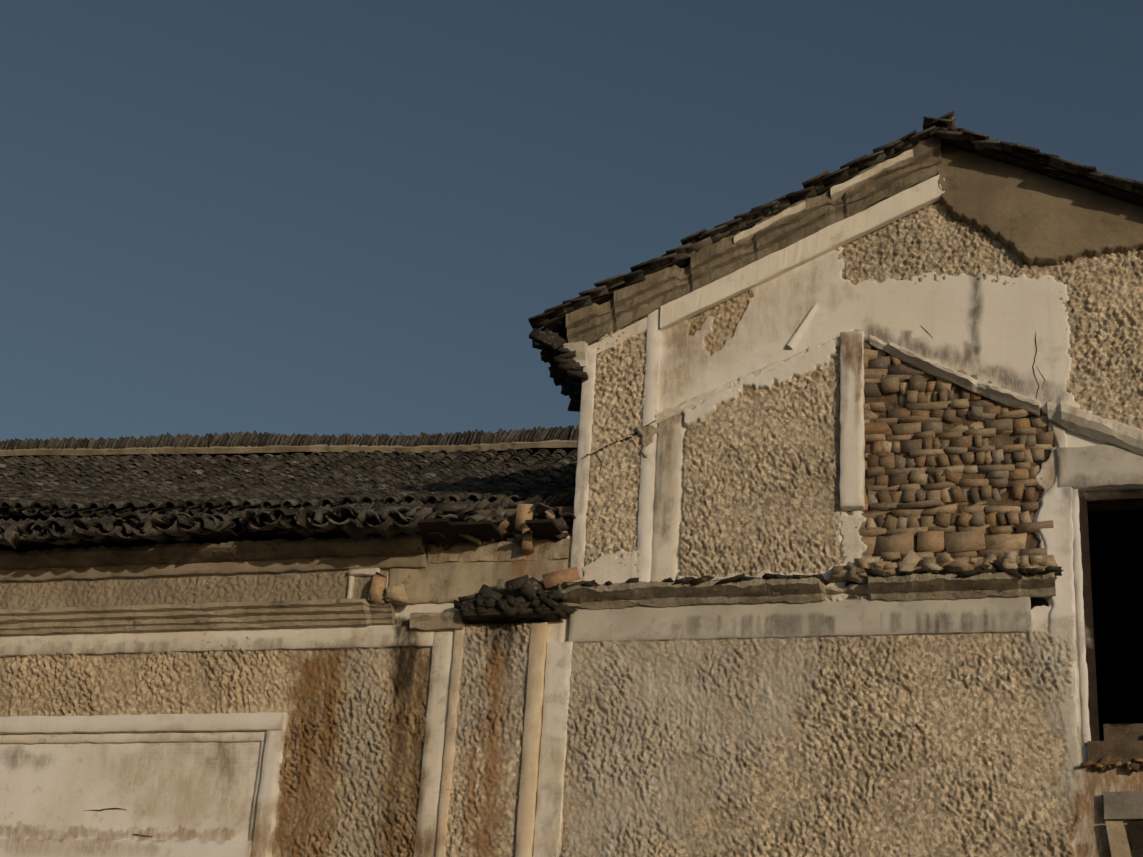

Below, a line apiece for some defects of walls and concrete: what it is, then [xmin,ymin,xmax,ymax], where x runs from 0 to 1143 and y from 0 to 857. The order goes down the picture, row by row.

spalling [686,290,753,358]
peeling [836,144,1143,430]
peeling [478,548,644,604]
flaking render [676,339,1058,602]
leakage [278,651,342,857]
leakage [376,618,432,857]